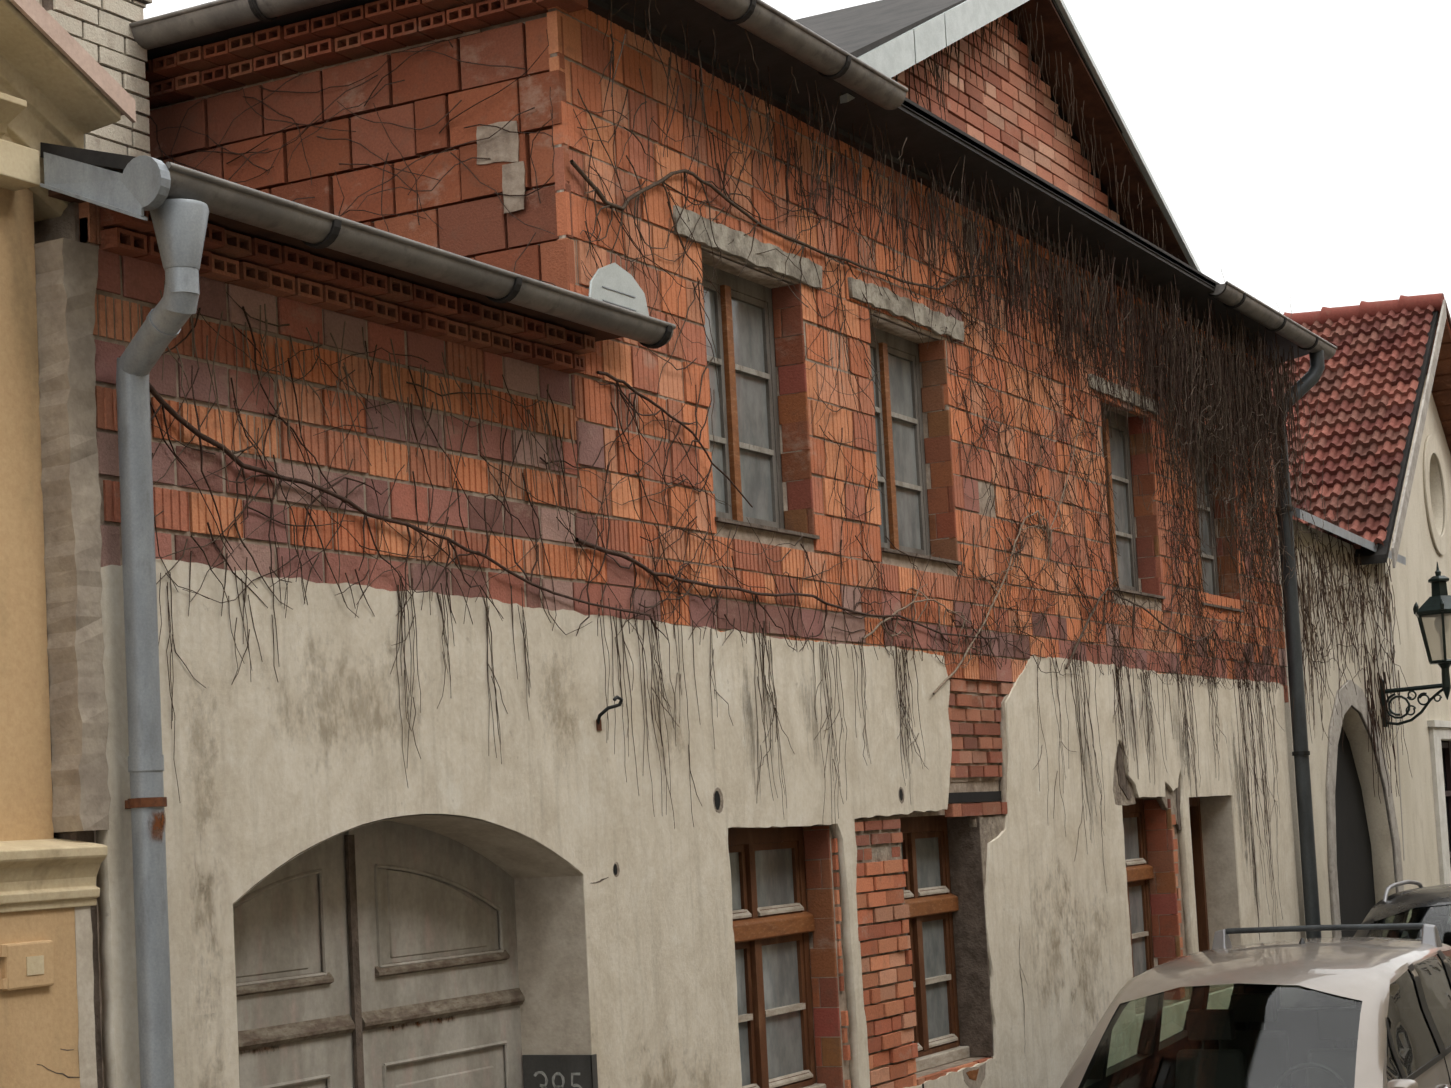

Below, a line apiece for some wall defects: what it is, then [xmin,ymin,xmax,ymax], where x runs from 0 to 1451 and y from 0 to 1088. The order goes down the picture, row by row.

rust [152,811,166,840]
flaking render [945,671,1015,893]
flaking render [1113,743,1136,806]
flaking render [1155,779,1182,830]
flaking render [854,787,918,1088]
flaking render [963,1013,994,1088]